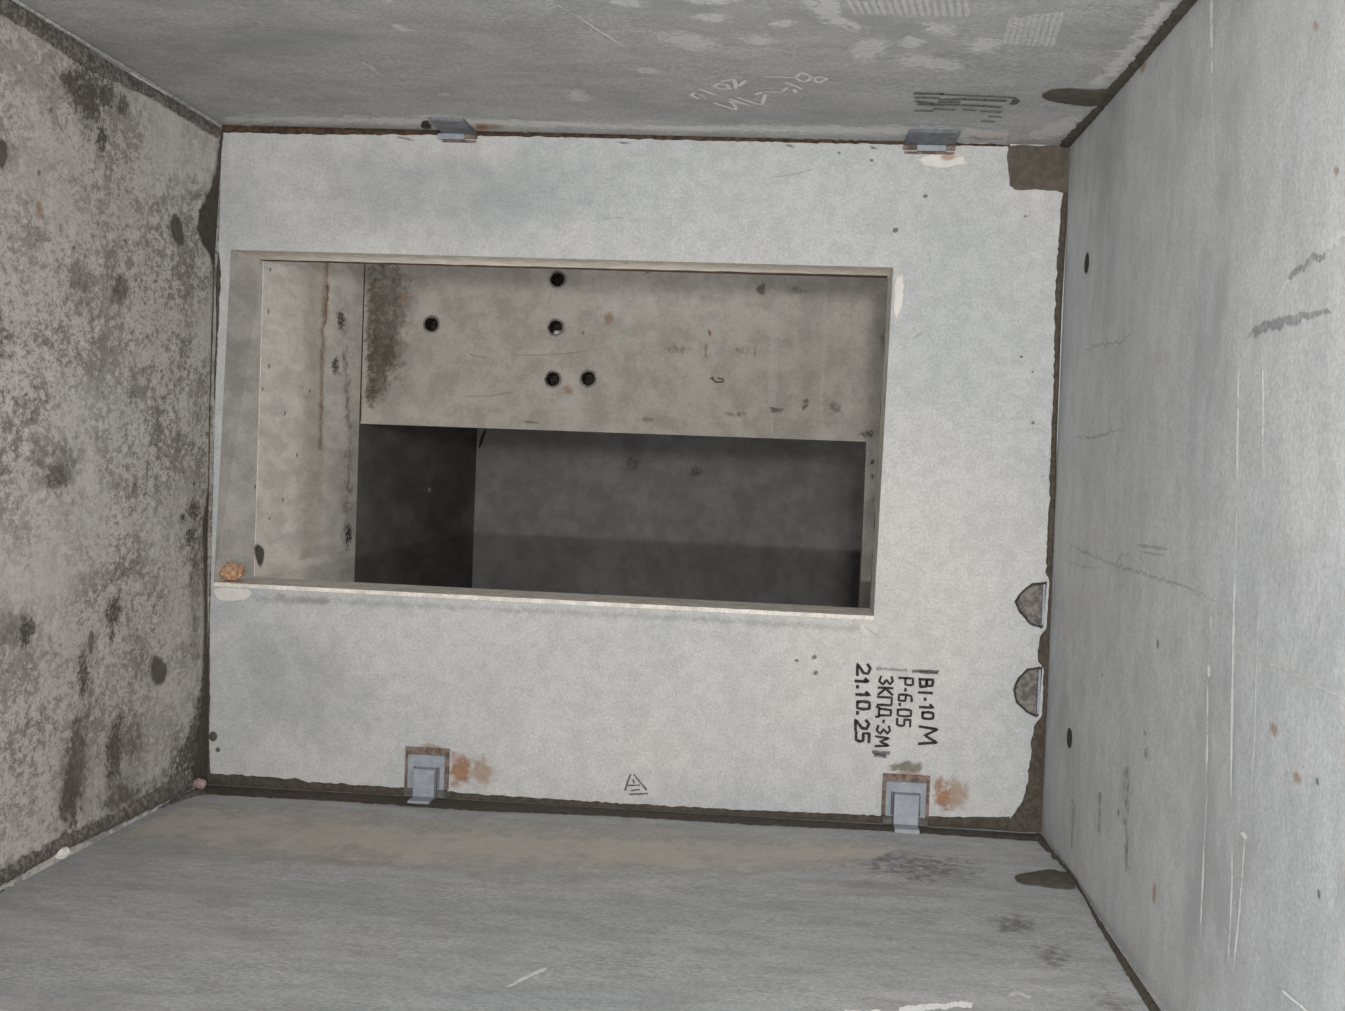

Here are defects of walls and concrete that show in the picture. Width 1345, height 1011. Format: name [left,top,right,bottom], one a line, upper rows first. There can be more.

damp [59,58,129,152]
damp [170,214,184,245]
damp [110,276,130,305]
damp [16,616,40,647]
damp [77,595,123,696]
damp [152,656,167,685]
damp [60,716,88,832]
damp [102,707,134,813]
damp [169,678,203,781]